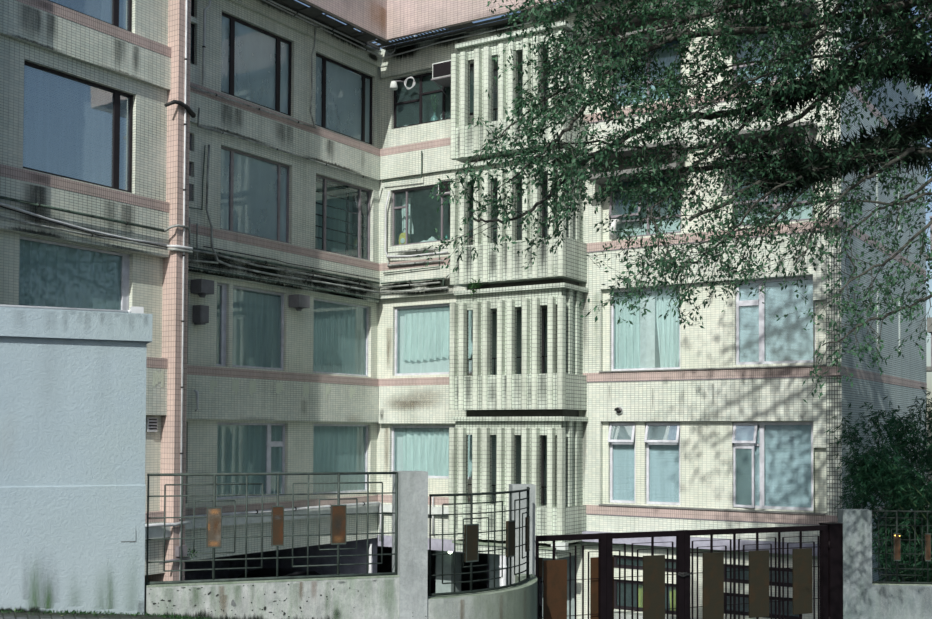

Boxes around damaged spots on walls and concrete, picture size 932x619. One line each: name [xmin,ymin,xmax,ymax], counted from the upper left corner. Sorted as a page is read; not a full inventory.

damp [13,186,60,238]
damp [0,591,50,612]